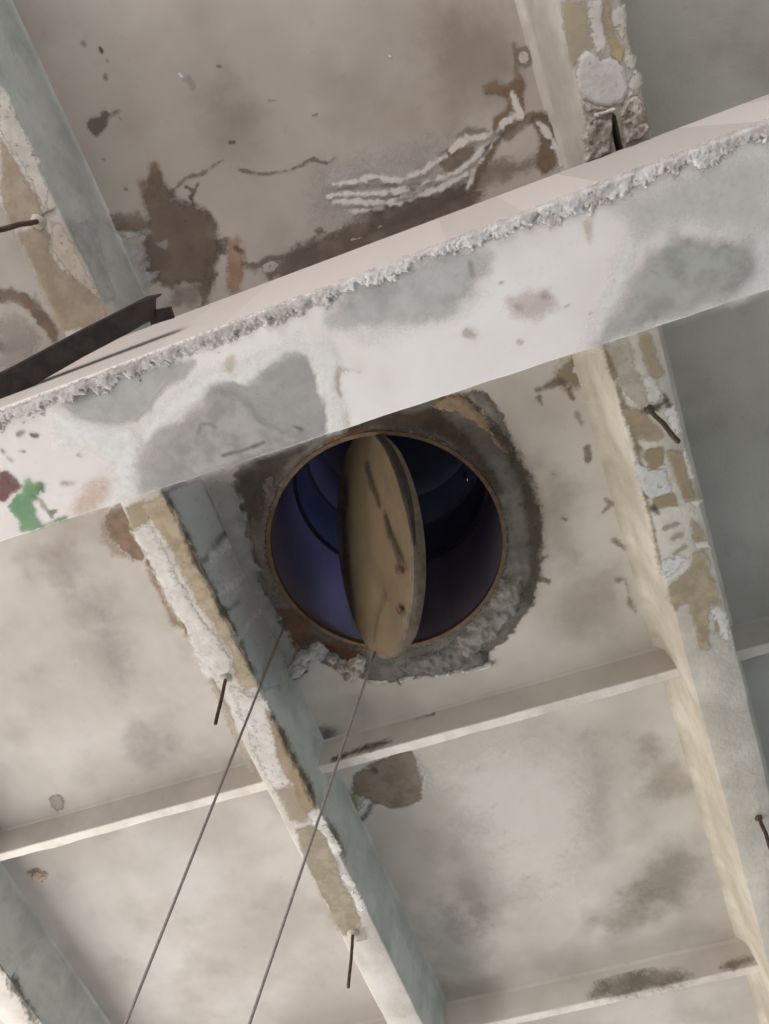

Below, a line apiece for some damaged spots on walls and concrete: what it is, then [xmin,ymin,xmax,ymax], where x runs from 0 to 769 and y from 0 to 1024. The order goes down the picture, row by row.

peeling [564,0,649,163]
spalling [0,86,769,439]
leakage [585,160,769,347]
peeling [126,497,367,942]
leakage [54,336,502,669]
spalling [287,640,415,684]
peeling [604,332,702,514]
peeling [652,521,733,651]
leakage [593,971,683,997]